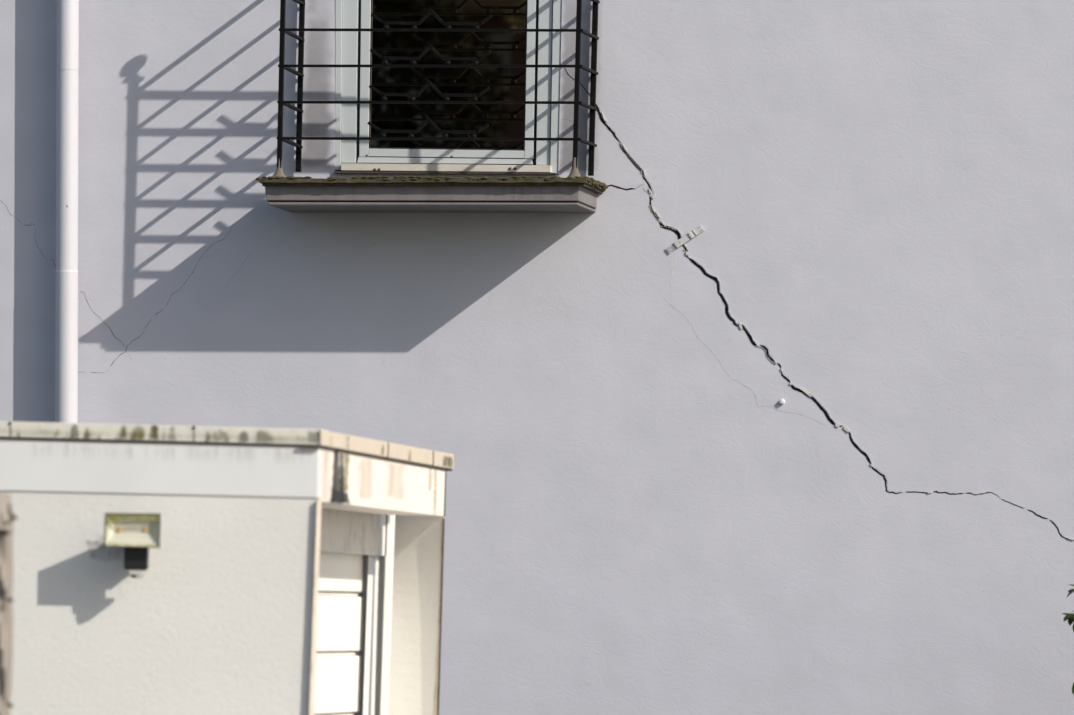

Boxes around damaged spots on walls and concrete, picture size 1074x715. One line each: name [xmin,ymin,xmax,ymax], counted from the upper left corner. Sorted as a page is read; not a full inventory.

water stain [331,451,350,503]
crack [565,69,1073,540]